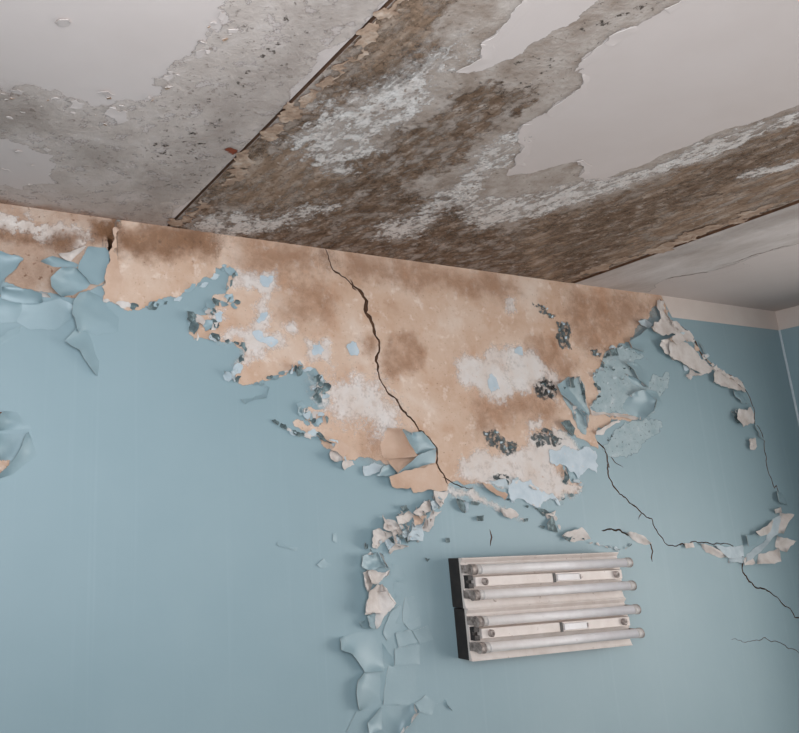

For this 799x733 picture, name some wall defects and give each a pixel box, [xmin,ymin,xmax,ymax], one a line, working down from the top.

leakage [0,0,799,283]
crack [325,249,473,489]
peeling [0,0,799,565]
peeling [340,542,436,733]
crack [597,441,799,618]